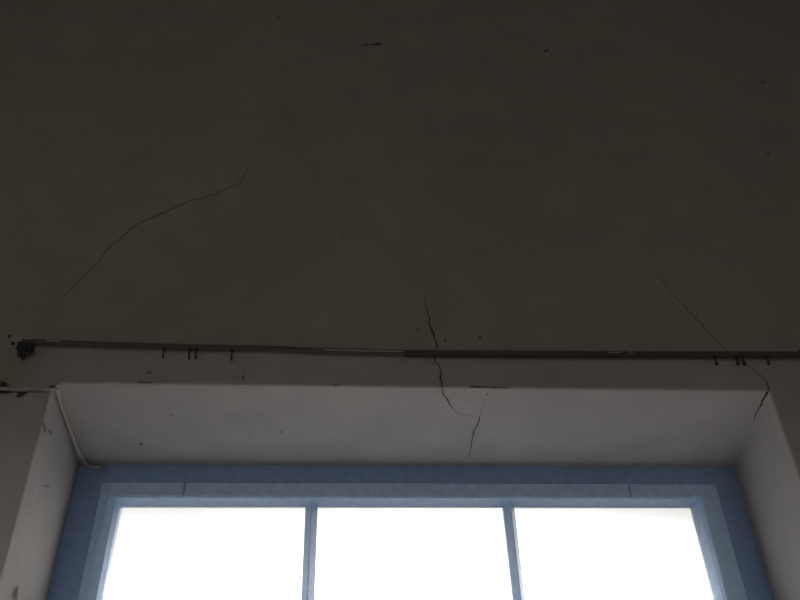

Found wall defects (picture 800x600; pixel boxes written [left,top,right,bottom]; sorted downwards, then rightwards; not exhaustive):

crack [425,298,454,410]
crack [747,364,769,421]